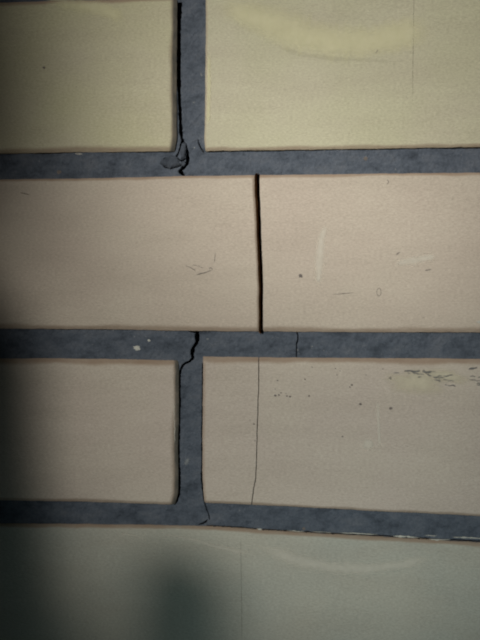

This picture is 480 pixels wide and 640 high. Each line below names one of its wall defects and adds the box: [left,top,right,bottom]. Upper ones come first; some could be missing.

crack [163,2,204,176]
crack [255,173,263,334]
crack [176,331,480,542]